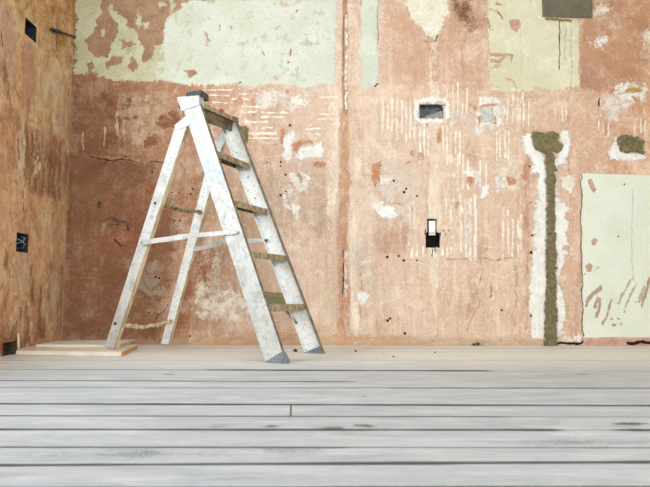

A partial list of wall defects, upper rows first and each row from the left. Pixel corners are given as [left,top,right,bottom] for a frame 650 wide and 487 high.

crack [68,11,163,229]
peeling [73,0,339,93]
crack [431,240,522,330]
peeling [580,173,650,346]